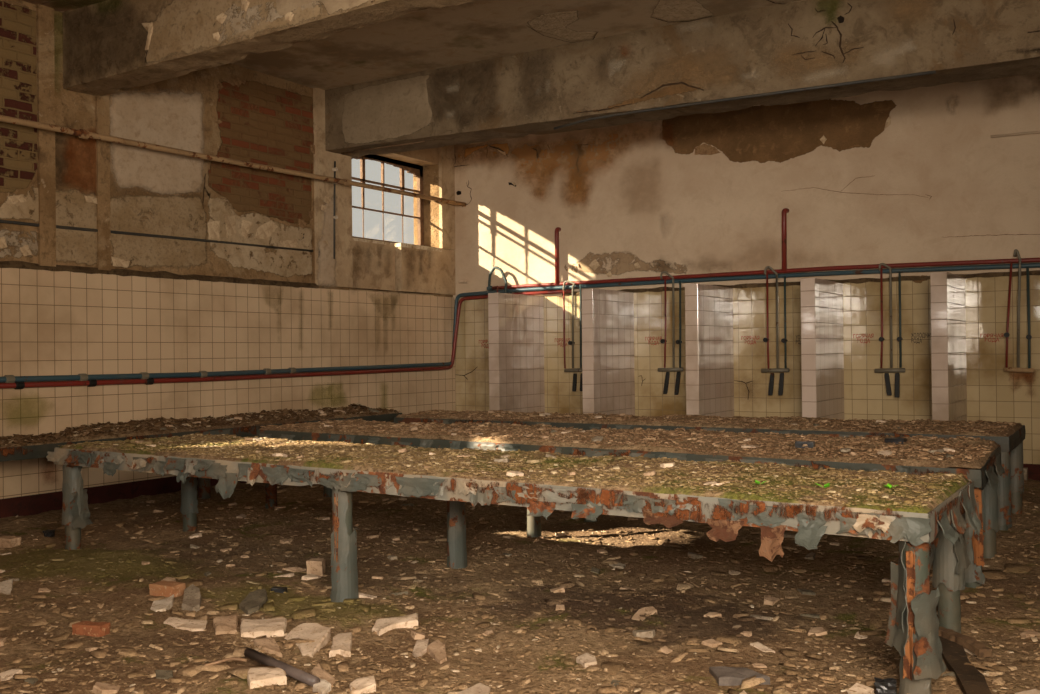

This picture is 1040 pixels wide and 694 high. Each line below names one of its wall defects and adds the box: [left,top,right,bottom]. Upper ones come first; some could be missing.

flaking render [142,0,375,63]
crack [767,0,863,62]
flaking render [0,1,39,258]
flaking render [56,76,336,286]
water stain [455,128,653,202]
flaking render [662,99,897,163]